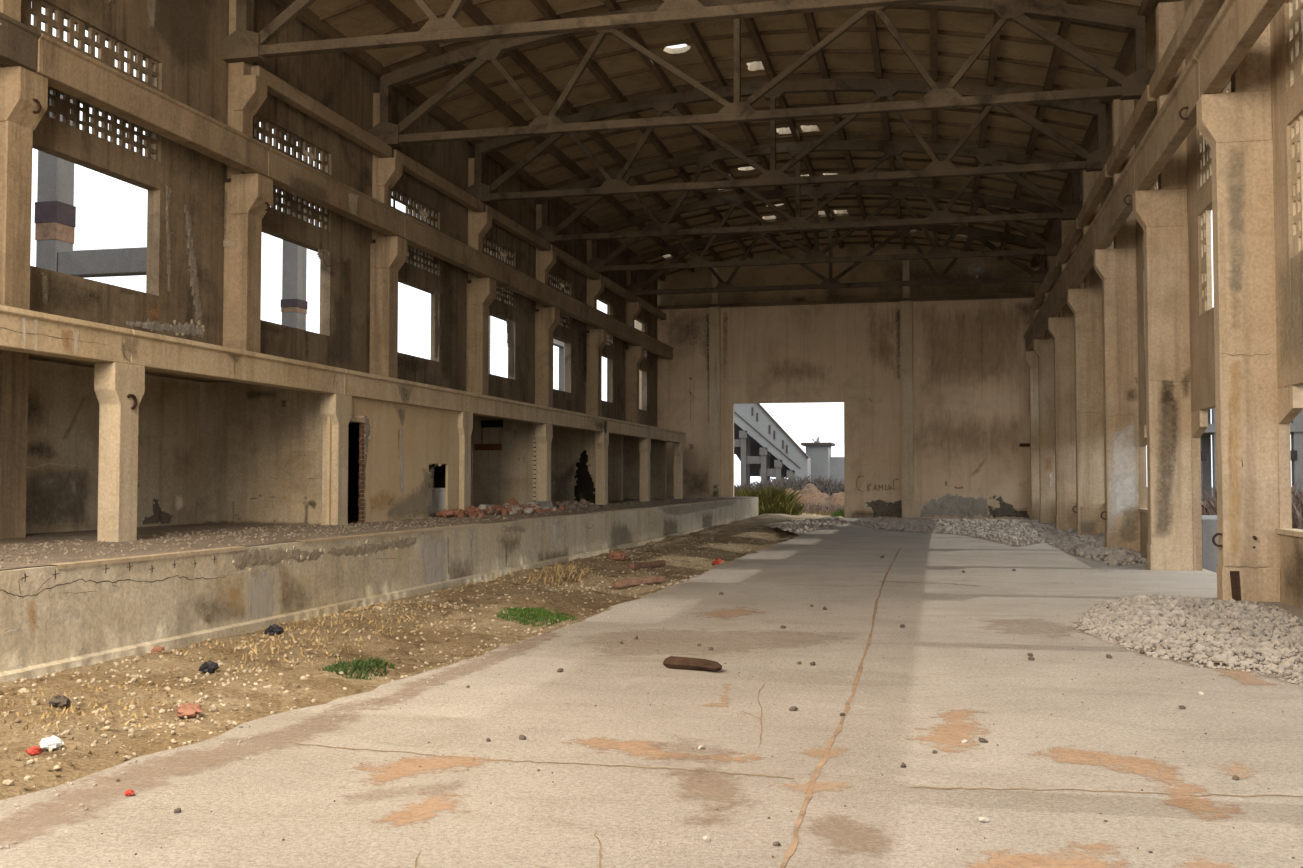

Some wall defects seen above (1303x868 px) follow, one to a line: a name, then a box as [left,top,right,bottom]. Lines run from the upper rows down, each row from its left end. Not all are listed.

damp [26,473,85,523]
crack [0,569,235,597]
crack [742,684,764,748]